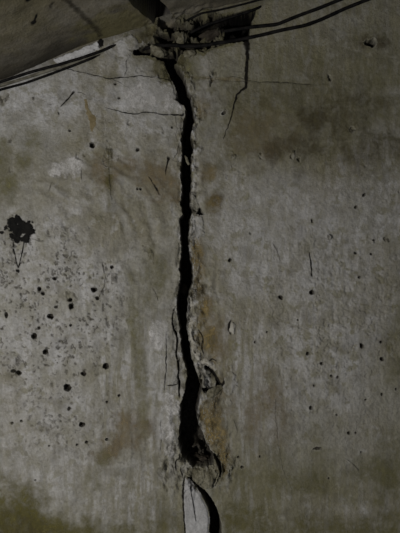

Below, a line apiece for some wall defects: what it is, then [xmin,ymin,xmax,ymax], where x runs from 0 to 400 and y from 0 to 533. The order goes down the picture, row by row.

spalling [54,9,256,86]
crack [223,41,250,138]
crack [68,60,237,533]
peeling [184,478,210,533]